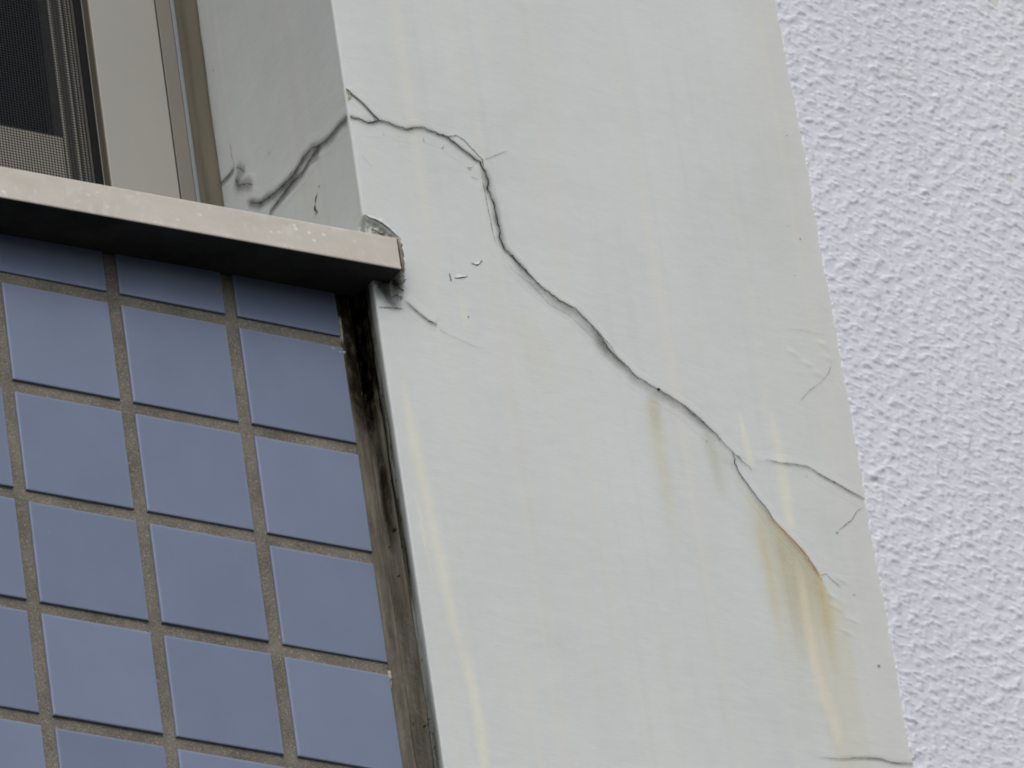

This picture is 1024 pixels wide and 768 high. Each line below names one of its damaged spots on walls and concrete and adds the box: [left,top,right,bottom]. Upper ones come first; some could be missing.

leakage [337,286,412,613]
spalling [360,214,399,237]
crack [220,85,865,585]